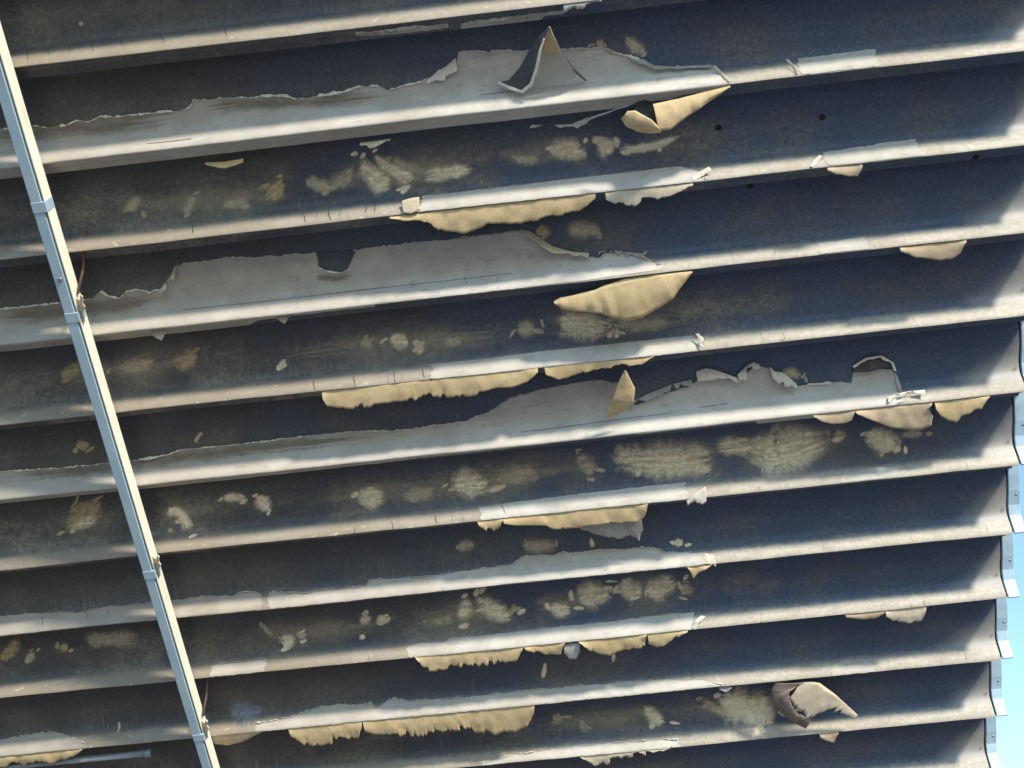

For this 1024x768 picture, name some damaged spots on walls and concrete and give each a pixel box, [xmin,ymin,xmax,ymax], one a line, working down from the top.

peeling [31,0,731,174]
peeling [83,166,712,342]
peeling [817,236,869,254]
peeling [0,302,73,352]
peeling [130,334,991,489]
peeling [0,462,118,504]
peeling [171,482,717,618]
peeling [0,601,157,636]
peeling [406,612,705,672]
peeling [255,678,731,746]
peeling [771,682,857,729]
peeling [0,731,87,767]